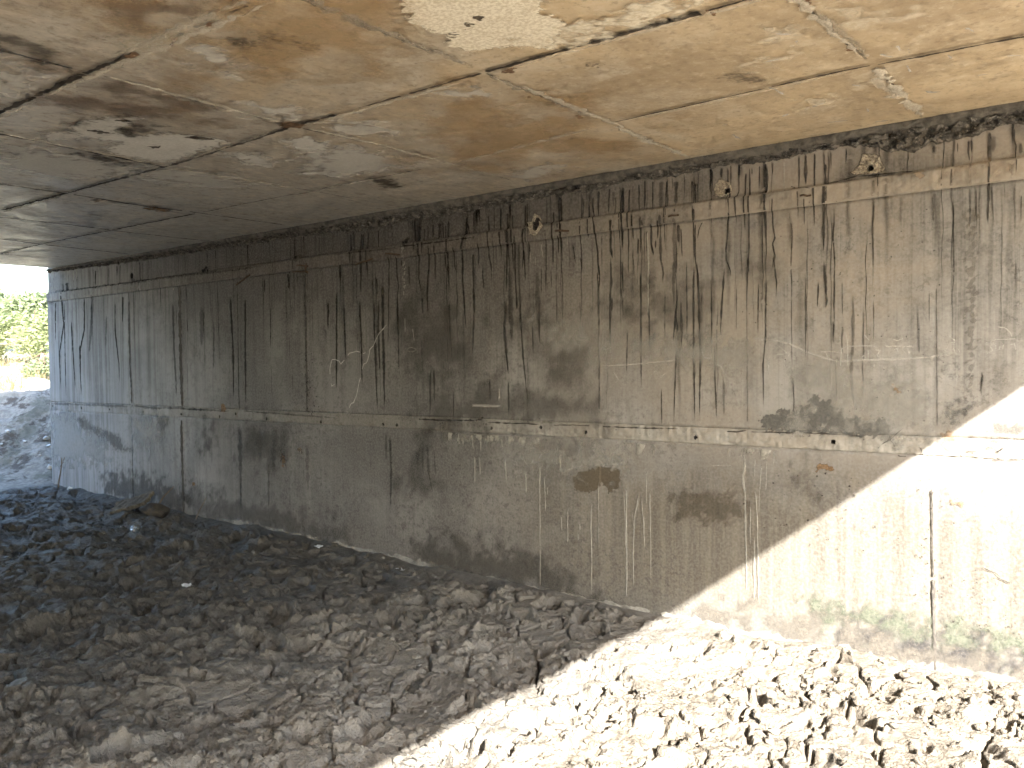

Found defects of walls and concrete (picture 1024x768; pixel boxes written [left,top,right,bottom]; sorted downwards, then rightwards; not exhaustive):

peeling [398,0,706,51]
spalling [48,109,1024,273]
damp [976,133,993,221]
damp [45,269,96,390]
damp [327,164,783,420]
damp [797,153,843,353]
damp [862,208,874,373]
damp [758,369,891,441]
damp [418,485,599,602]
damp [624,472,651,595]
damp [661,448,822,642]
damp [831,616,1024,683]